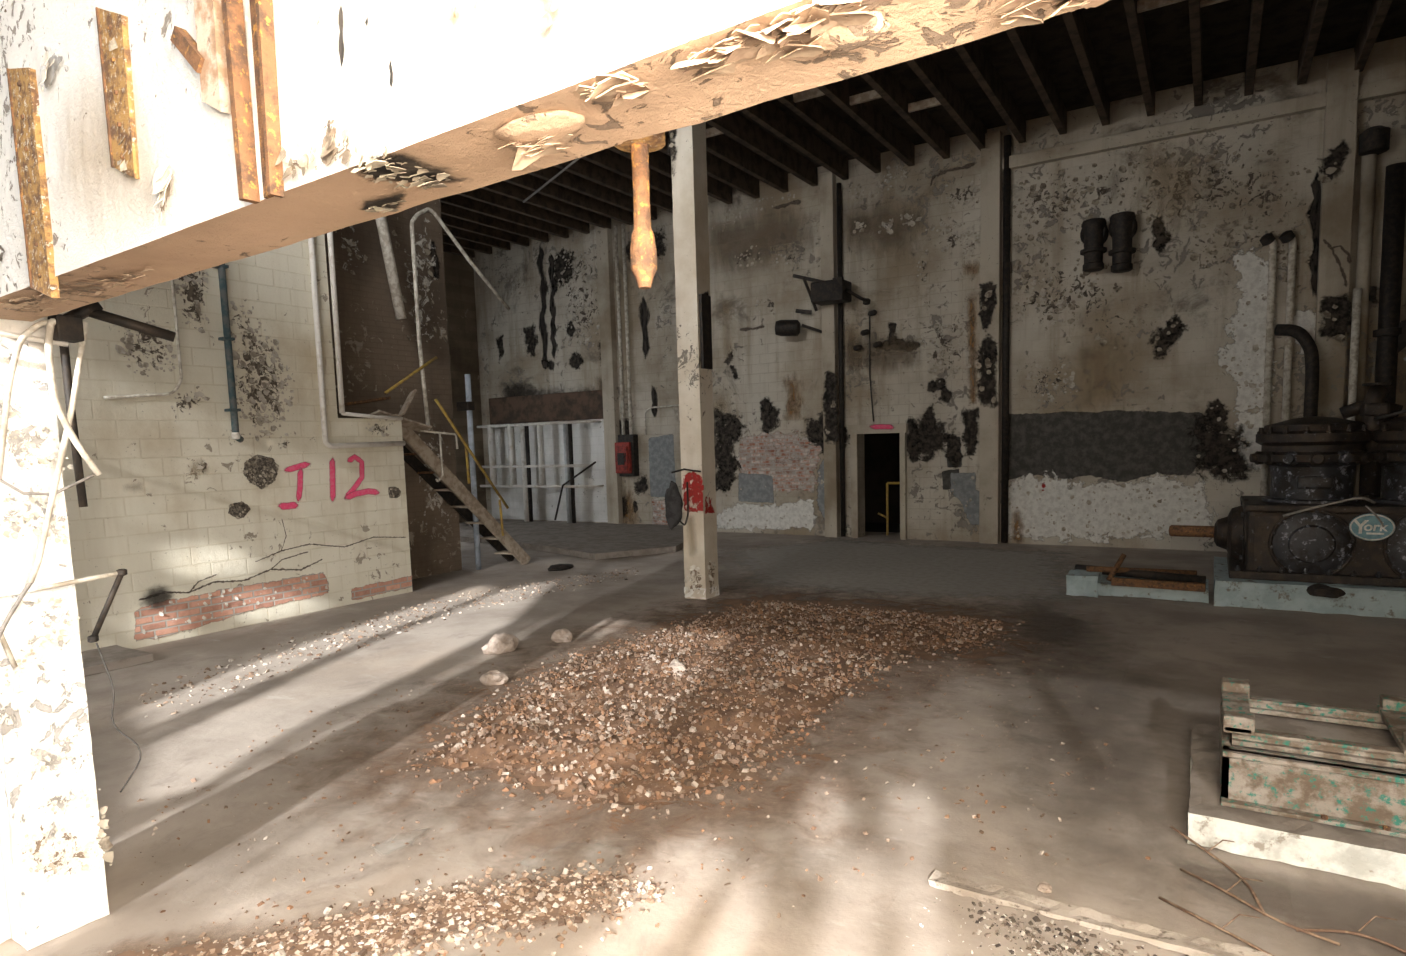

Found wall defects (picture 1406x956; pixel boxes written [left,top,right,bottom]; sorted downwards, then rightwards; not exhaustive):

peeling [671,0,876,81]
peeling [992,0,1109,26]
peeling [576,71,650,106]
rust [117,135,127,175]
peeling [497,134,573,171]
flaking render [1000,144,1345,545]
spalling [648,434,676,525]
spalling [717,429,830,532]
spalling [942,437,979,525]
crack [139,520,406,600]
spalling [134,572,329,641]
spalling [16,788,114,882]